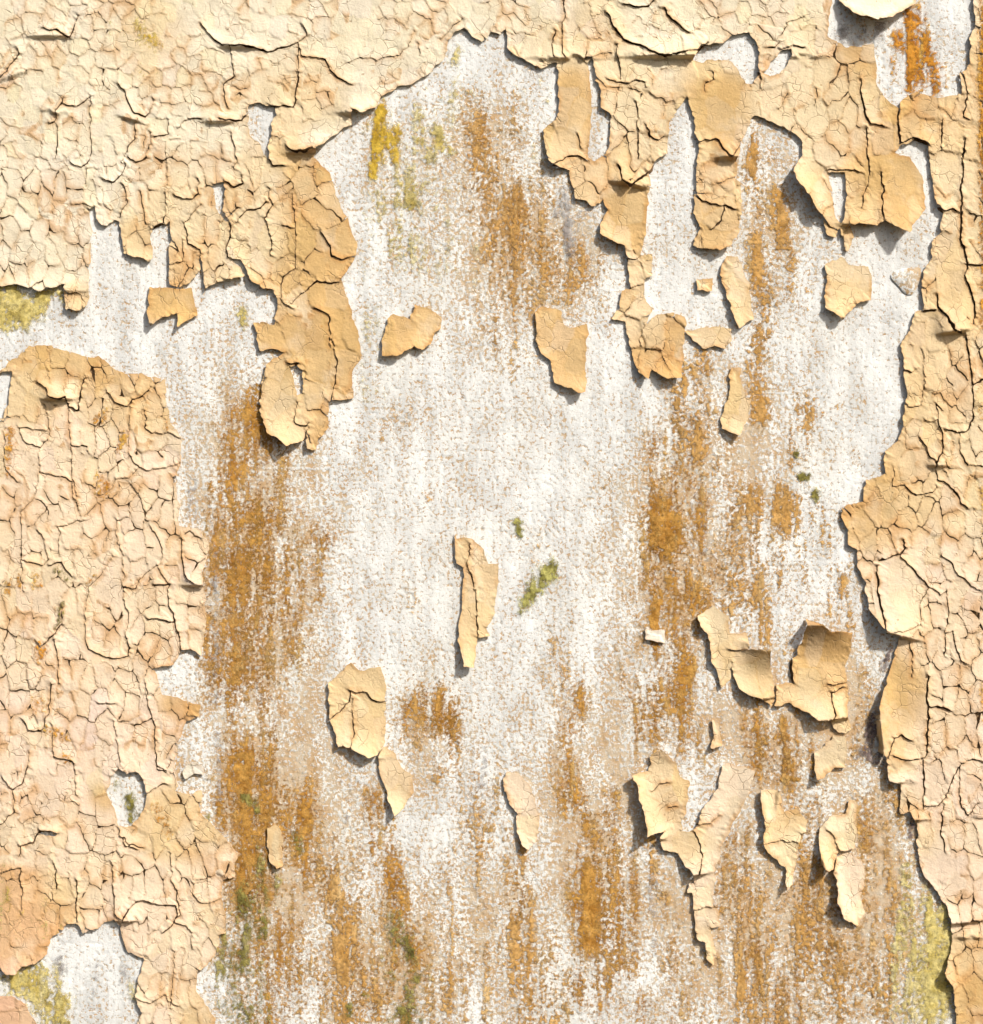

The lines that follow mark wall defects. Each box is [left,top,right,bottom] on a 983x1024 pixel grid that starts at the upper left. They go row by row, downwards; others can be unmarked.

crack [3,378,193,775]
peeling [0,345,249,1024]
spalling [0,206,283,557]
crack [50,26,421,400]
rust [452,89,605,392]
spalling [152,28,943,1024]
rust [195,378,919,1024]
rust [605,127,863,772]
spalling [828,0,916,108]
rust [890,1,948,97]
crack [876,540,983,847]
crack [112,829,221,1009]